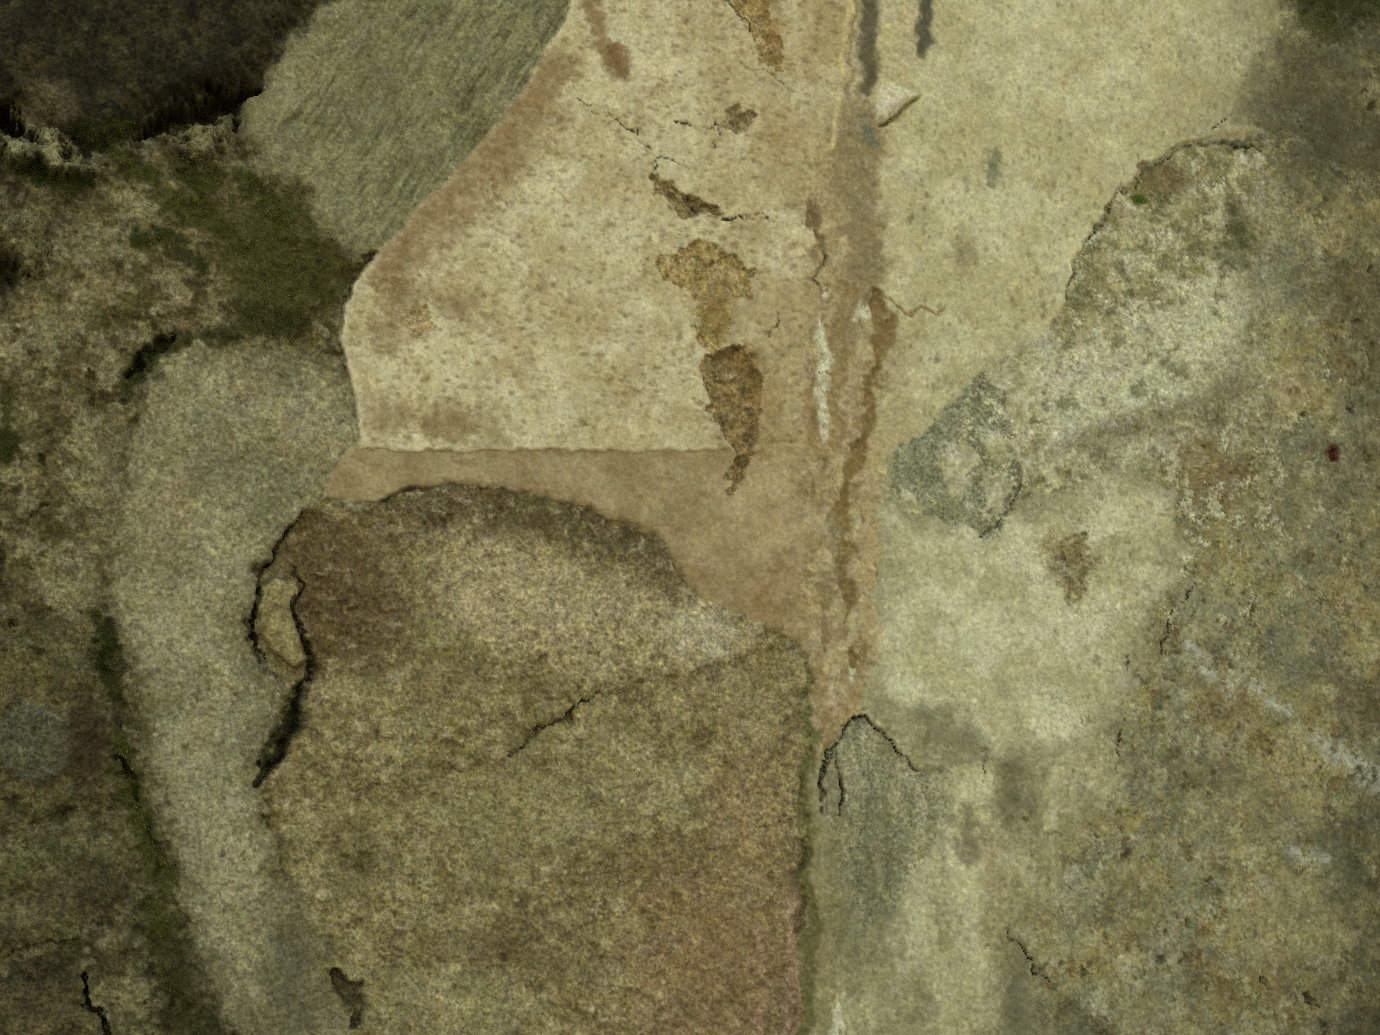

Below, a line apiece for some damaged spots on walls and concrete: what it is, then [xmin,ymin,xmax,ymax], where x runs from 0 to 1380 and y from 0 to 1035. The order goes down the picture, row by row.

spalling [731,0,785,77]
spalling [649,168,725,220]
spalling [655,239,765,496]
crack [263,528,311,696]
crack [819,715,914,800]